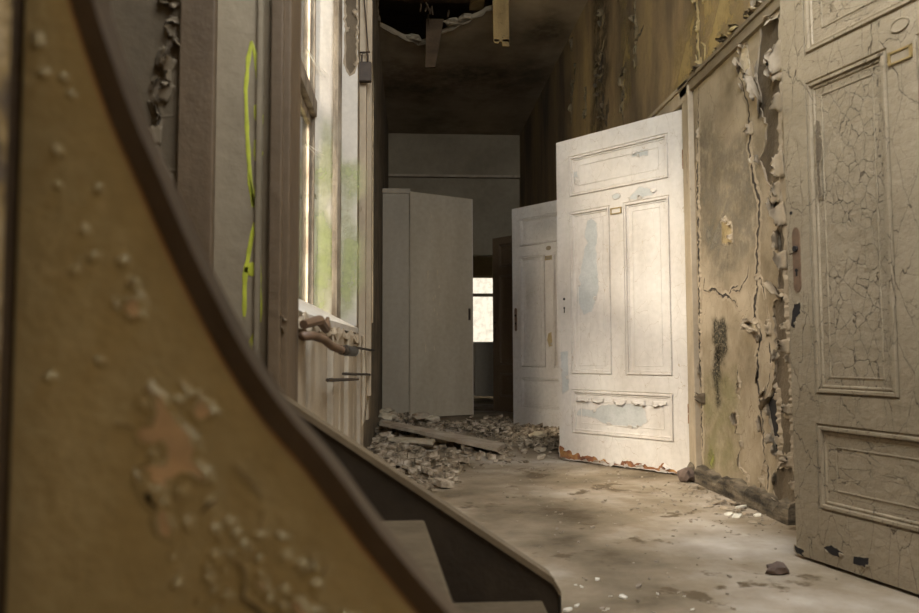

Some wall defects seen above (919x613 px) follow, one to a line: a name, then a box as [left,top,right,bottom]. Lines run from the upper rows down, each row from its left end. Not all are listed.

flaking render [404,33,422,43]
flaking render [443,13,474,26]
crack [691,0,772,493]
flaking render [714,0,802,503]
leakage [712,319,727,404]
peeling [130,377,223,548]